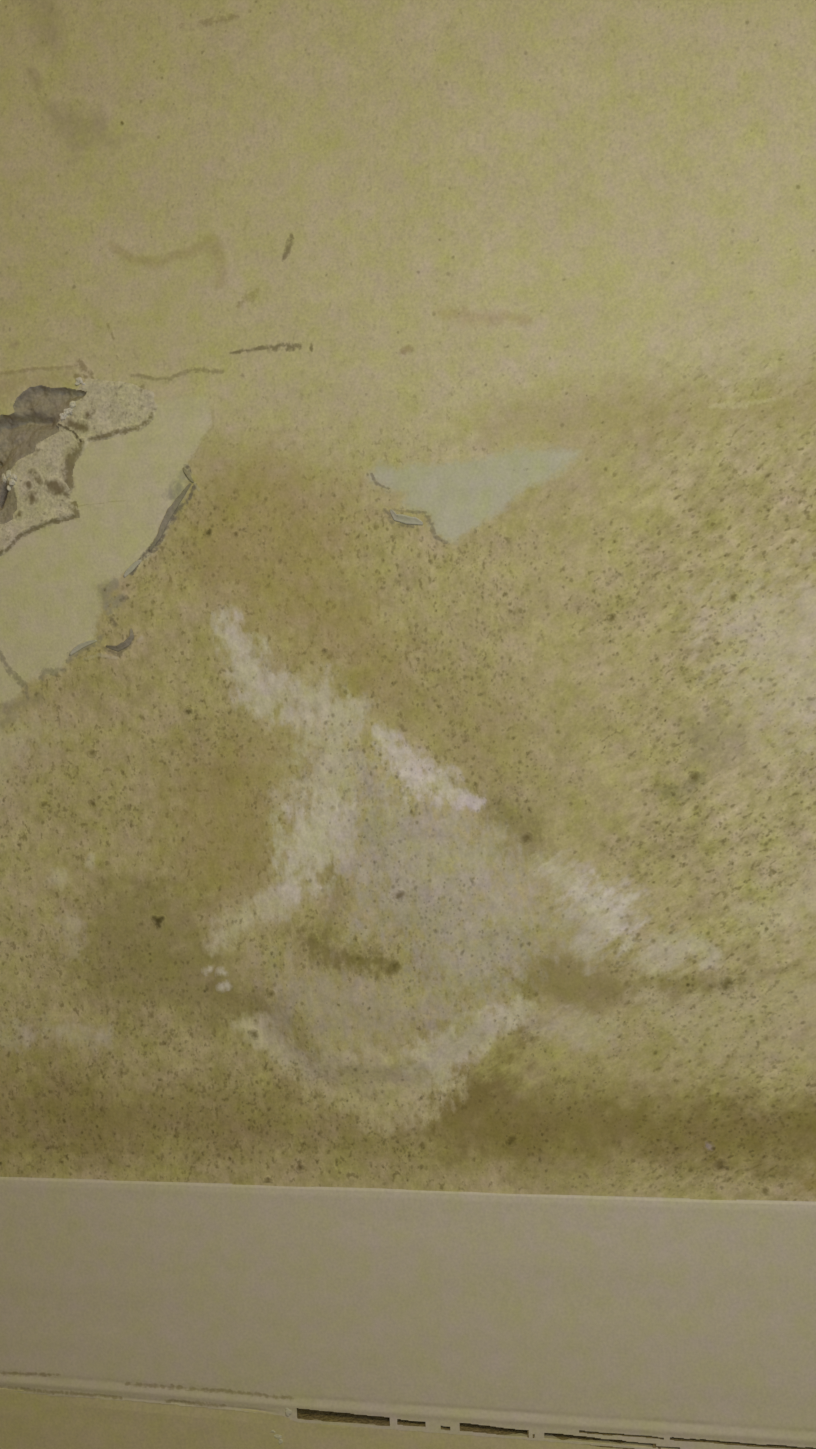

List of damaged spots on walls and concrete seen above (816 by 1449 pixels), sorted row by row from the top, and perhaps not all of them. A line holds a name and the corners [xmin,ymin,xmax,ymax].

leakage [0,338,81,414]
leakage [436,358,816,467]
peeling [362,440,589,551]
peeling [0,377,220,819]
leakage [0,423,816,1195]